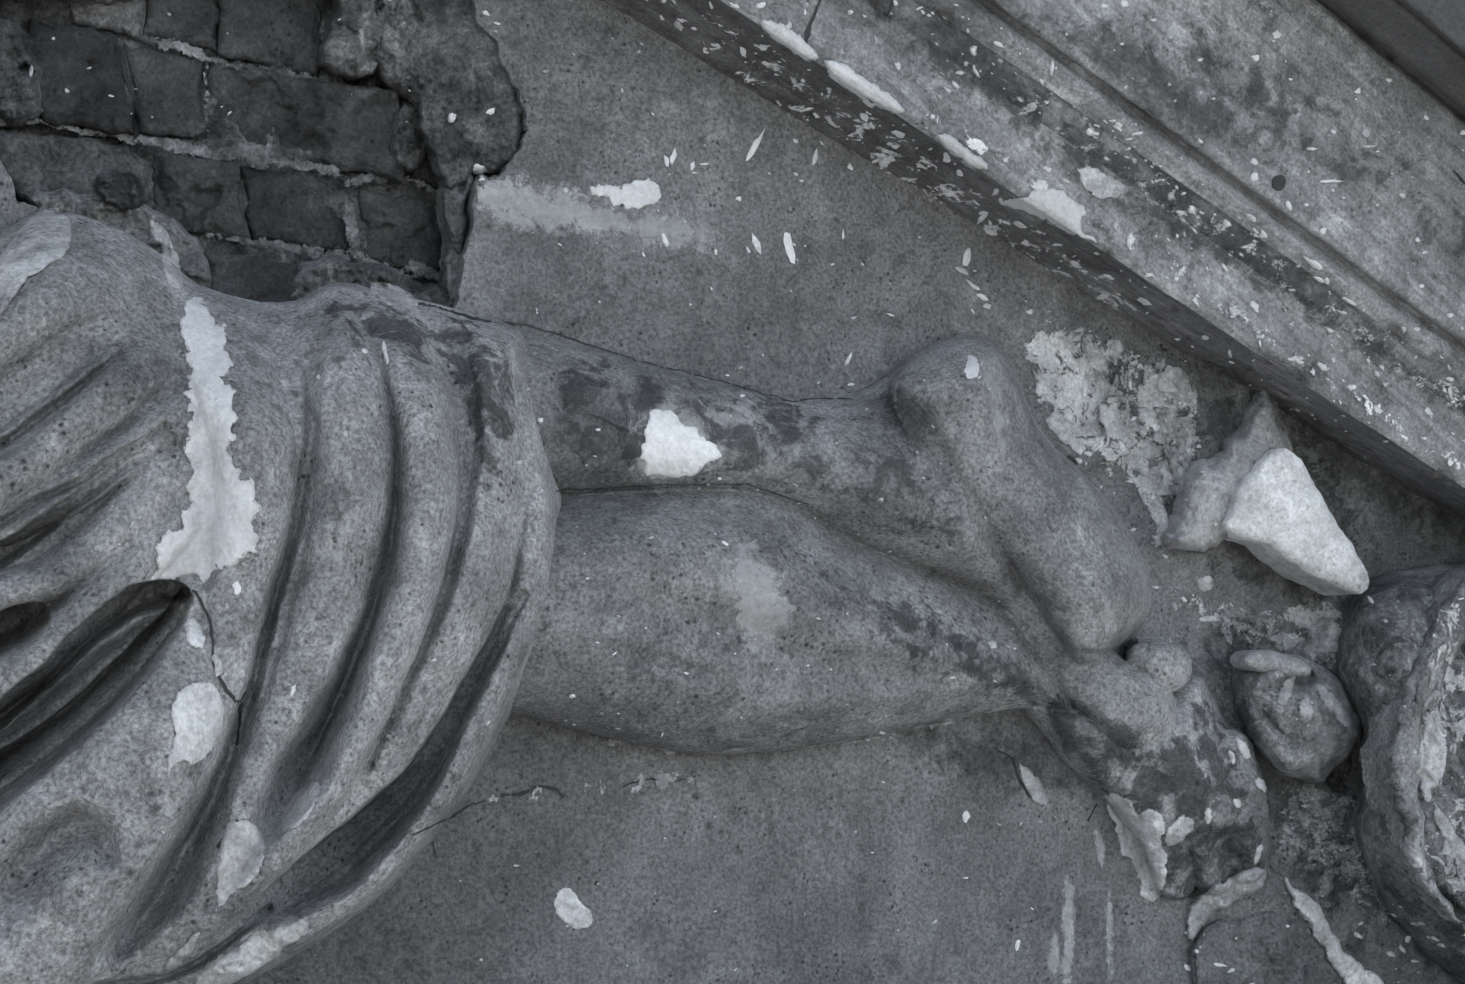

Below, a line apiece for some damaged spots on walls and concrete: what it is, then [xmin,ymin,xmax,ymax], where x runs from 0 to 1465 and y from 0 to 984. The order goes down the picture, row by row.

peeling [669,0,985,207]
peeling [959,135,1011,168]
flaking render [0,0,523,583]
peeling [640,409,722,478]
peeling [983,219,1143,313]
peeling [1024,322,1351,727]
peeling [1150,240,1465,470]
crack [176,580,246,746]